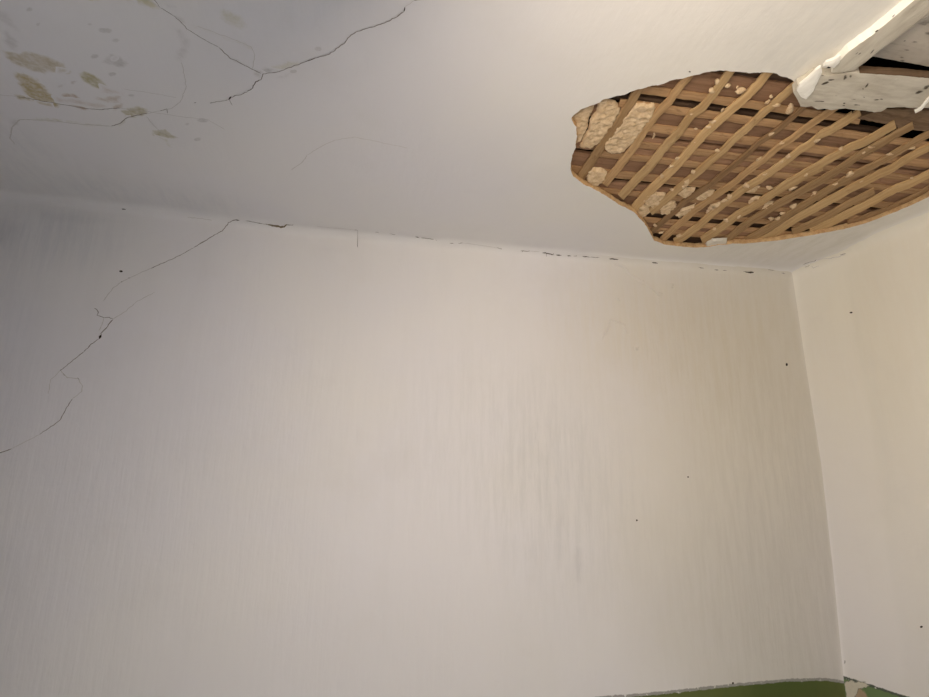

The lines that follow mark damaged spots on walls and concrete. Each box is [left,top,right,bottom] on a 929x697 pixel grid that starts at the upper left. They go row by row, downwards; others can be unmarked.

damp [0,9,202,149]
crack [3,0,419,144]
flaking render [571,54,929,248]
crack [0,217,287,453]
peeling [845,680,869,697]